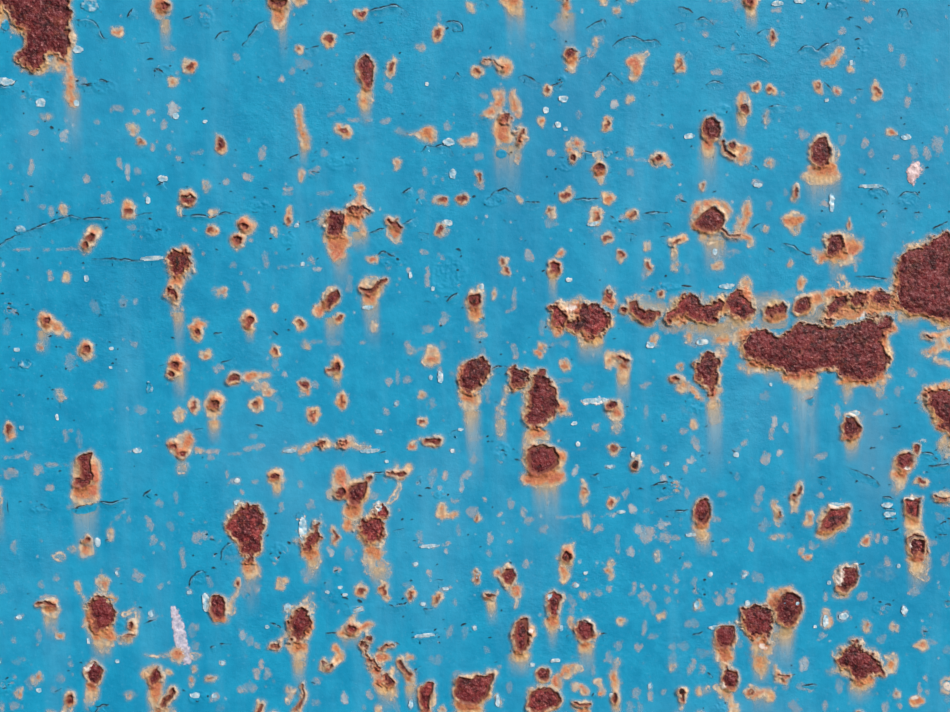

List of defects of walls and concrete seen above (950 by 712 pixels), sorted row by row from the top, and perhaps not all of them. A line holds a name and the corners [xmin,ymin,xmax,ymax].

rust [0,0,76,106]
rust [783,133,840,232]
rust [547,219,950,438]
rust [457,355,493,445]
rust [500,343,570,500]
rust [918,382,950,458]
rust [70,451,101,522]
rust [83,578,138,647]
rust [208,502,267,623]
rust [269,598,315,712]
rust [677,587,804,712]
rust [832,622,897,693]